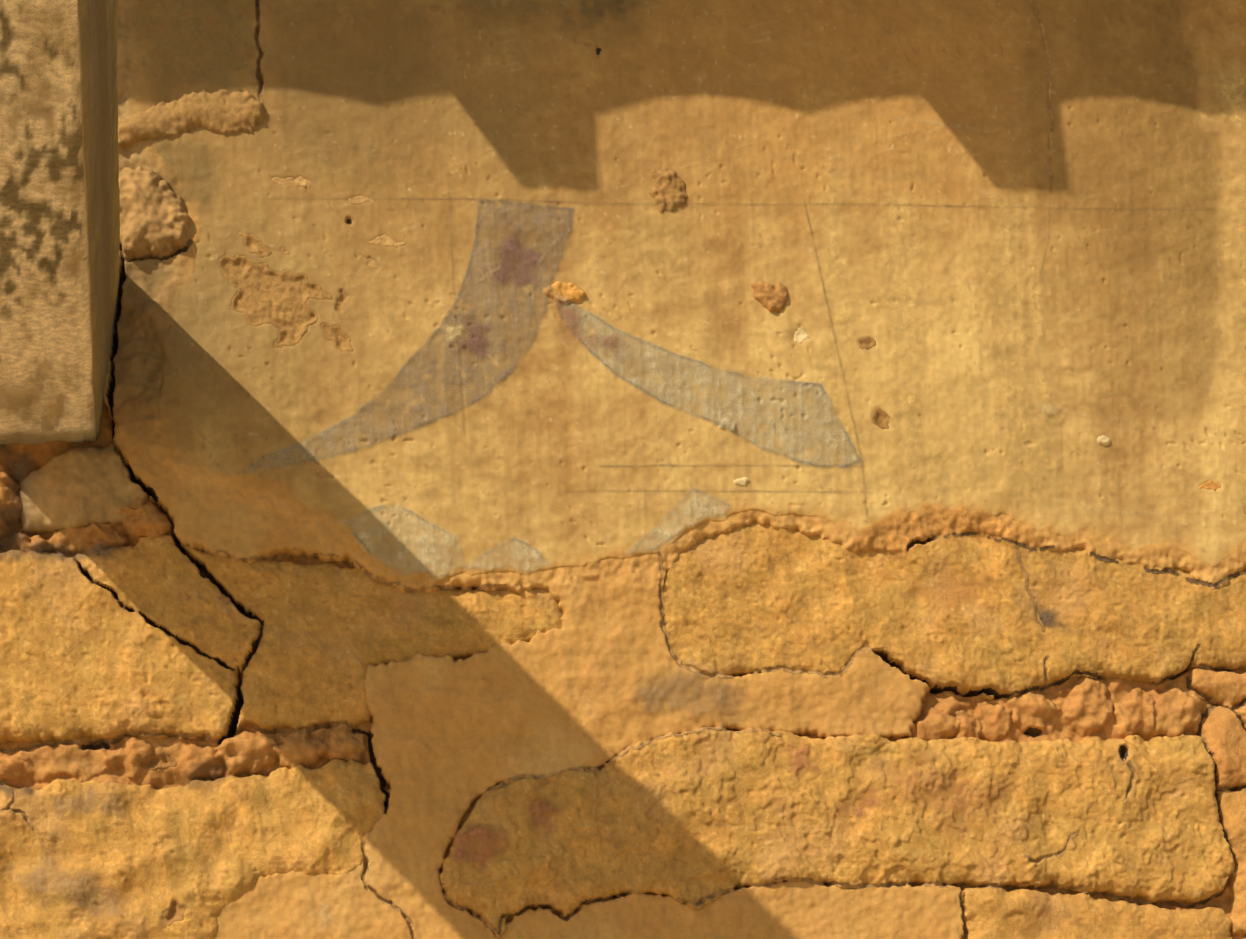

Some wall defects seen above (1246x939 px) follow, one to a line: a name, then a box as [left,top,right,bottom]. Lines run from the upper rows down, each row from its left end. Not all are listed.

crack [255,0,264,105]
crack [0,239,507,813]
crack [658,531,1101,700]
crack [1090,552,1246,588]
crack [0,789,32,828]
crack [676,644,1246,939]
crack [361,839,416,939]
crack [442,878,637,935]